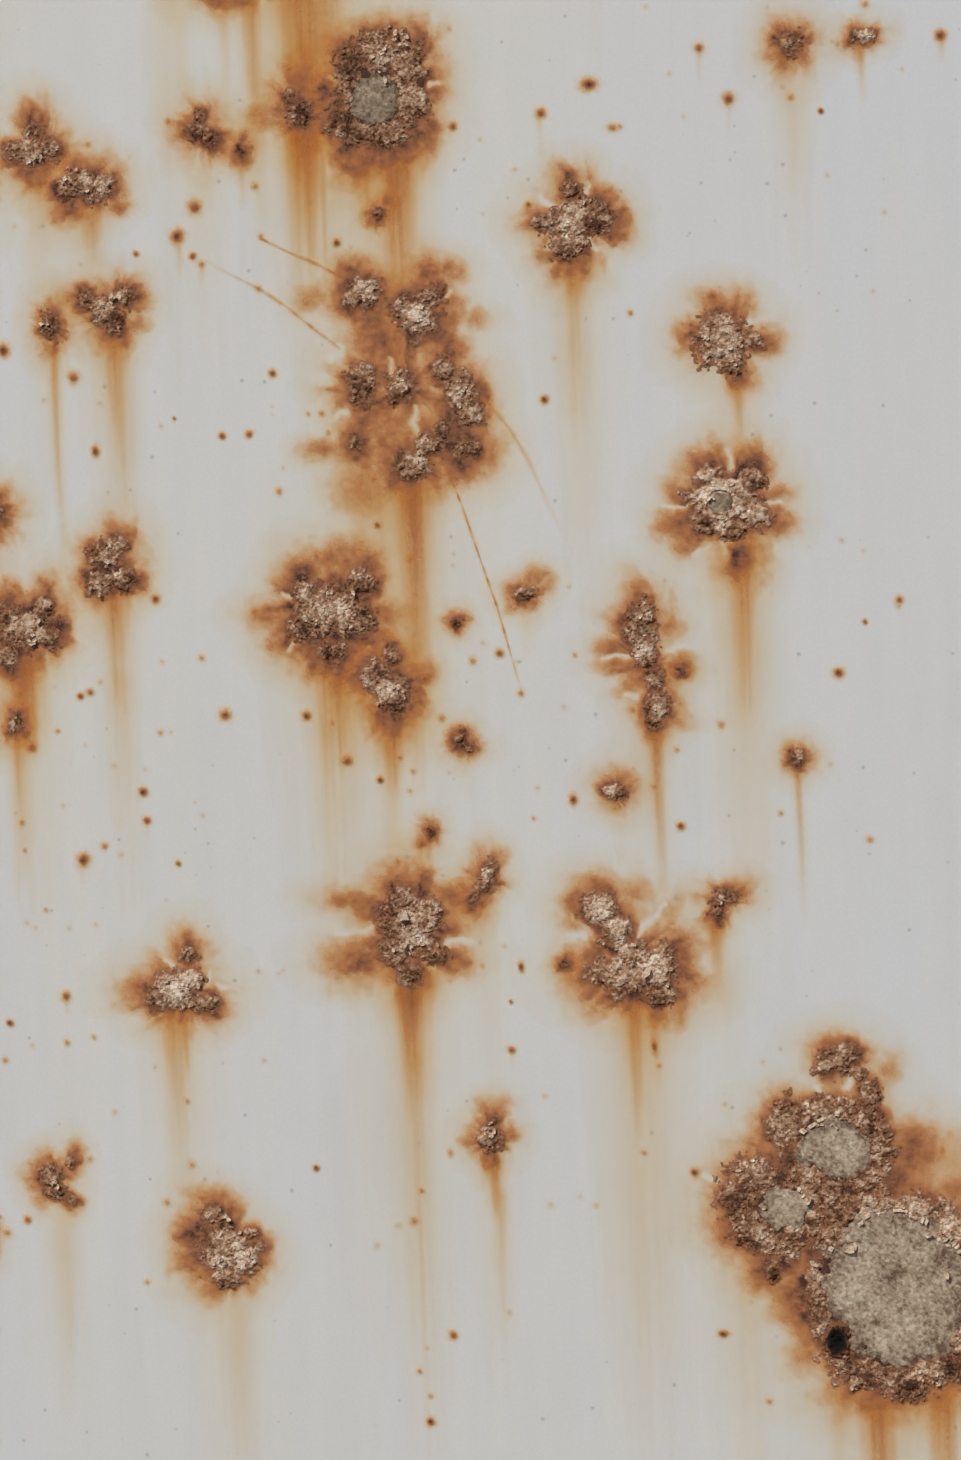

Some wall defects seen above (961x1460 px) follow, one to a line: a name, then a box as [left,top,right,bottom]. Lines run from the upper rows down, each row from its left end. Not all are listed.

rust [0,101,126,221]
rust [261,20,455,228]
rust [524,164,632,277]
rust [313,239,495,577]
rust [658,445,790,580]
rust [0,578,73,750]
rust [253,546,433,738]
rust [598,580,690,751]
rust [332,851,505,1032]
rust [555,876,699,1020]
rust [172,1191,273,1296]
rust [691,1035,961,1446]